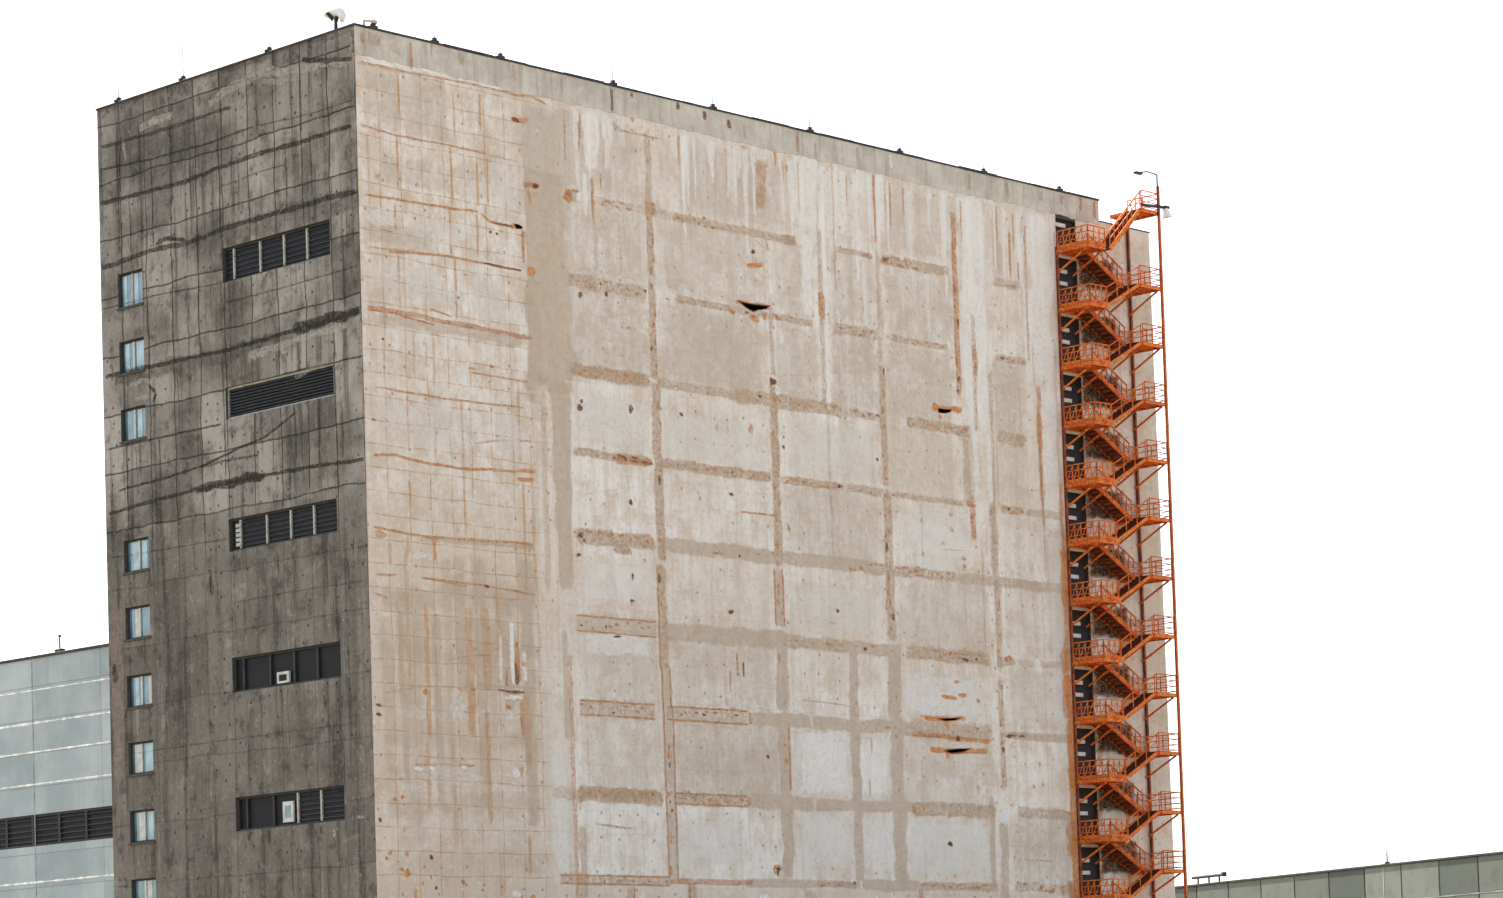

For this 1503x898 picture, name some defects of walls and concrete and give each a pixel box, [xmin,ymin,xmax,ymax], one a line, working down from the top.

damp [97,27,516,298]
spalling [729,299,785,344]
spalling [931,403,962,419]
rust [387,538,432,809]
rust [456,590,532,825]
peeling [901,672,990,759]
peeling [798,730,897,875]